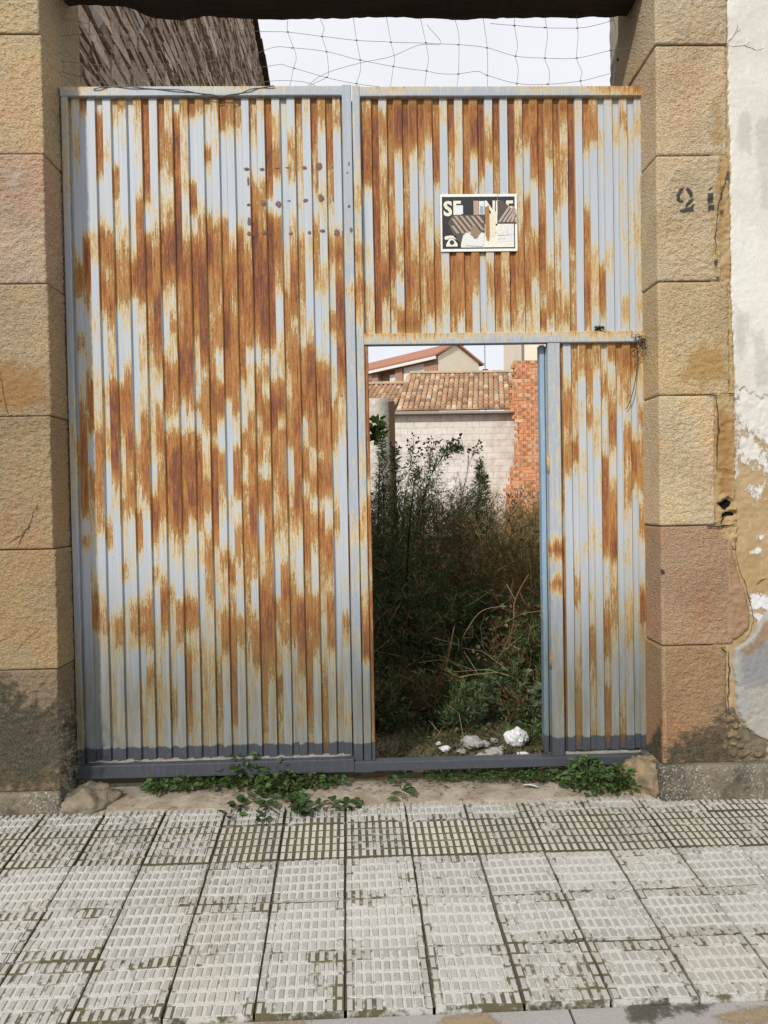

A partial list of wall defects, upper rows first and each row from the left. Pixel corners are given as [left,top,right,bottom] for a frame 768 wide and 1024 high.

corrosion [363,104,605,327]
crack [714,171,728,253]
corrosion [74,105,351,748]
corrosion [560,351,647,559]
peeling [733,385,768,508]
corrosion [562,539,582,742]
corrosion [589,585,618,678]
peeling [749,592,768,624]
corrosion [604,686,625,741]